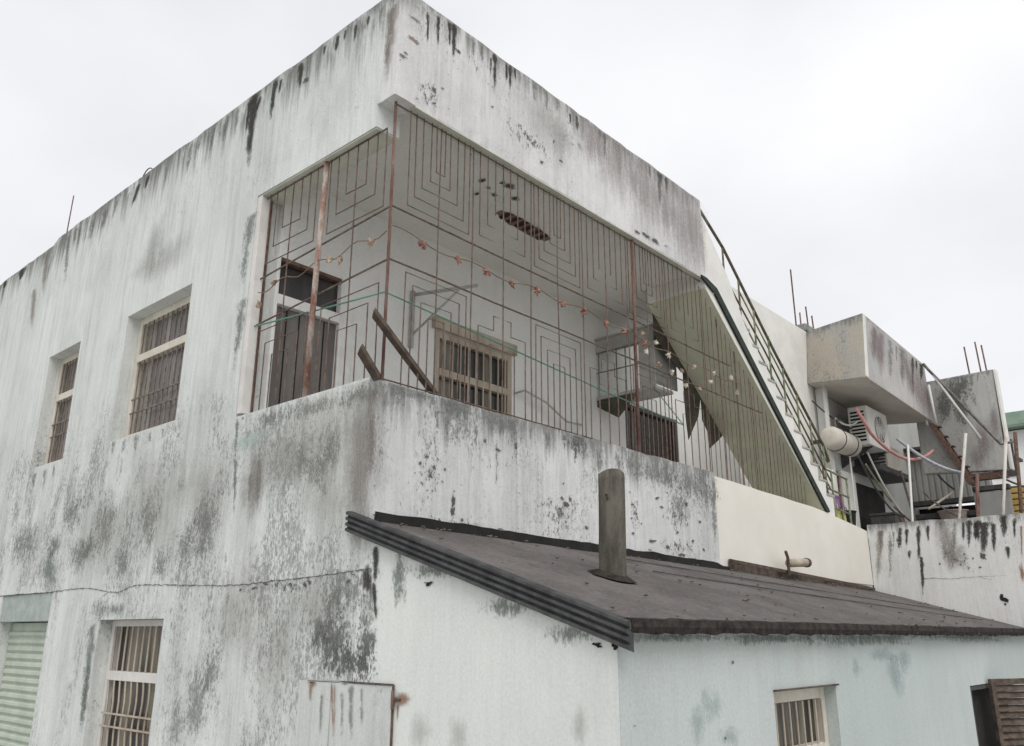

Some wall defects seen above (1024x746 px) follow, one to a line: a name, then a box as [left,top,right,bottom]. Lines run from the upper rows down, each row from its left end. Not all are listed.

leakage [426,15,516,89]
leakage [187,80,282,170]
leakage [569,114,700,246]
leakage [241,211,257,278]
leakage [234,300,246,358]
leakage [873,328,979,426]
leakage [43,383,531,590]
leakage [616,457,718,537]
crack [0,568,370,602]
leakage [878,525,930,592]
leakage [942,516,1016,562]
leakage [80,602,124,730]